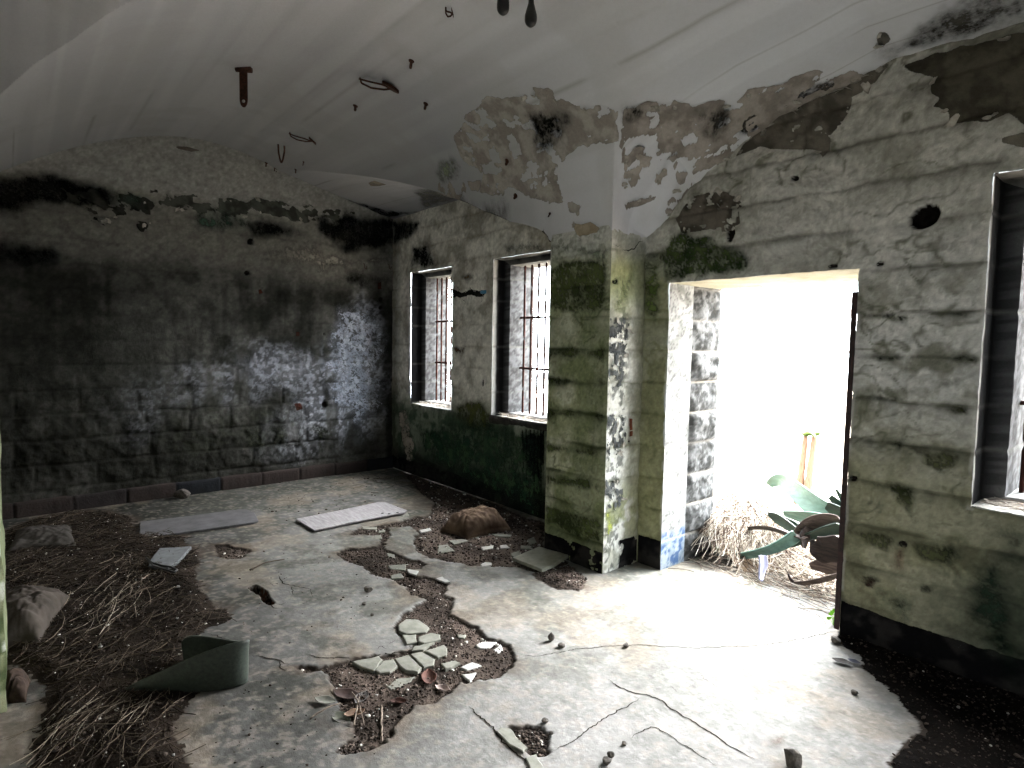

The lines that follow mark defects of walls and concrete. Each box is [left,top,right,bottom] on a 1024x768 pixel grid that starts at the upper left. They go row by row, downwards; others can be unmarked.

flaking render [454,64,888,242]